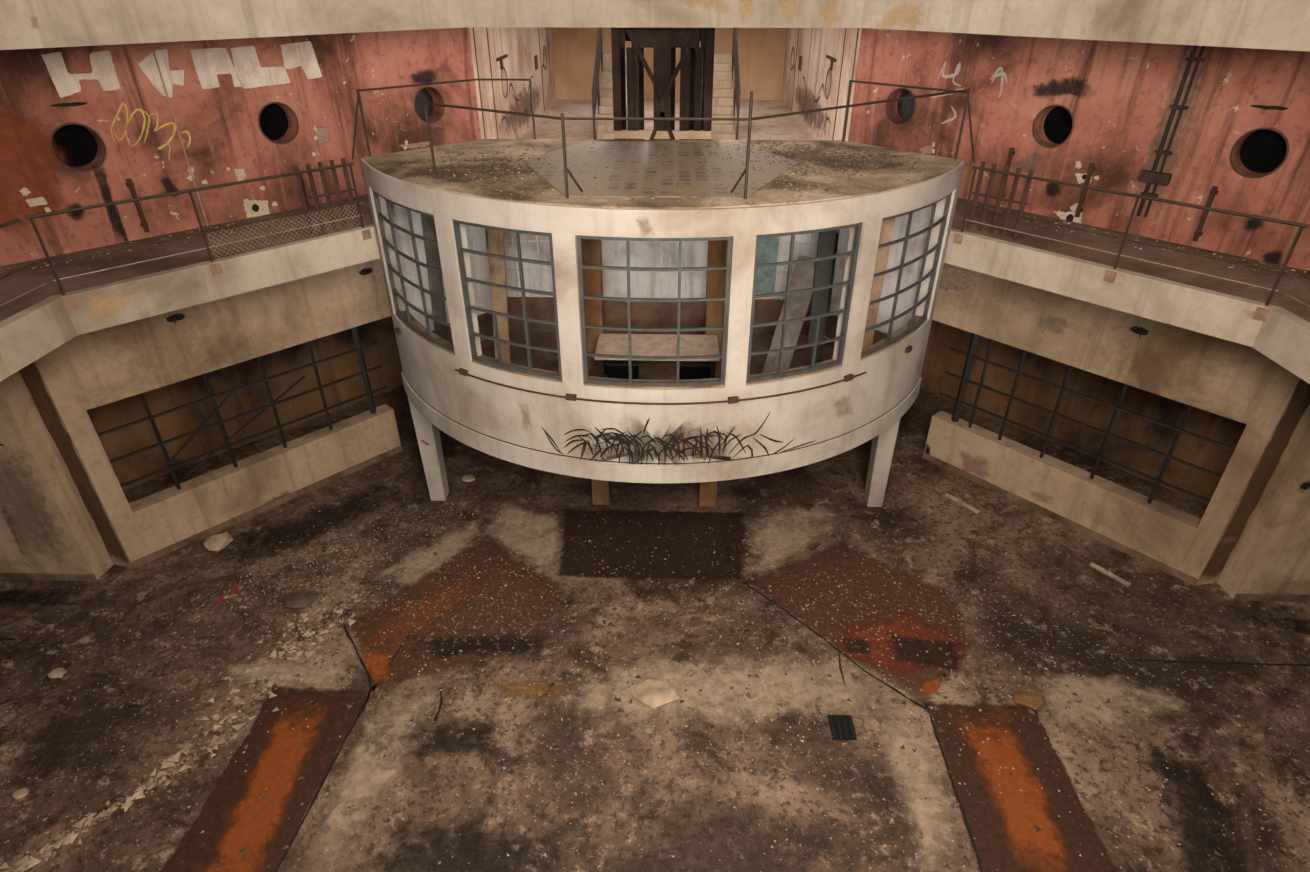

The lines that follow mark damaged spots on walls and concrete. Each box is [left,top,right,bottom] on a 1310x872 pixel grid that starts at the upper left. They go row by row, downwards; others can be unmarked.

corrosion [162,686,367,872]
corrosion [927,703,1117,872]